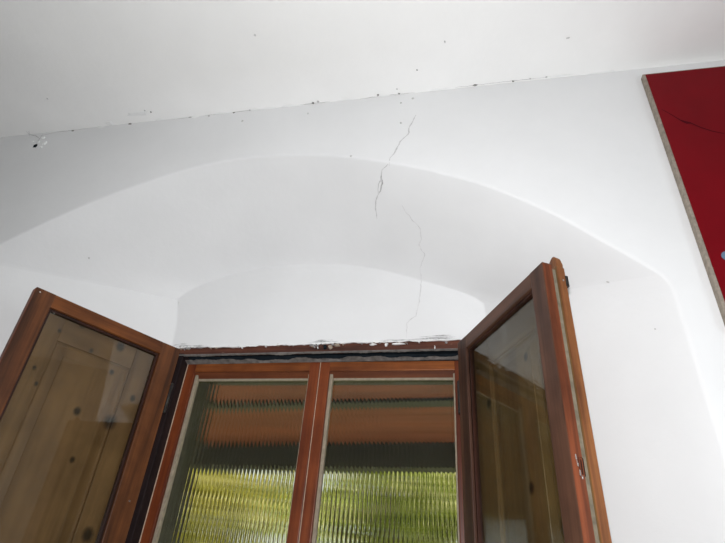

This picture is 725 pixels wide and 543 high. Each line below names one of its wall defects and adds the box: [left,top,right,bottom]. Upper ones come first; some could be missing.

crack [97,88,416,217]
flaking render [360,339,447,349]